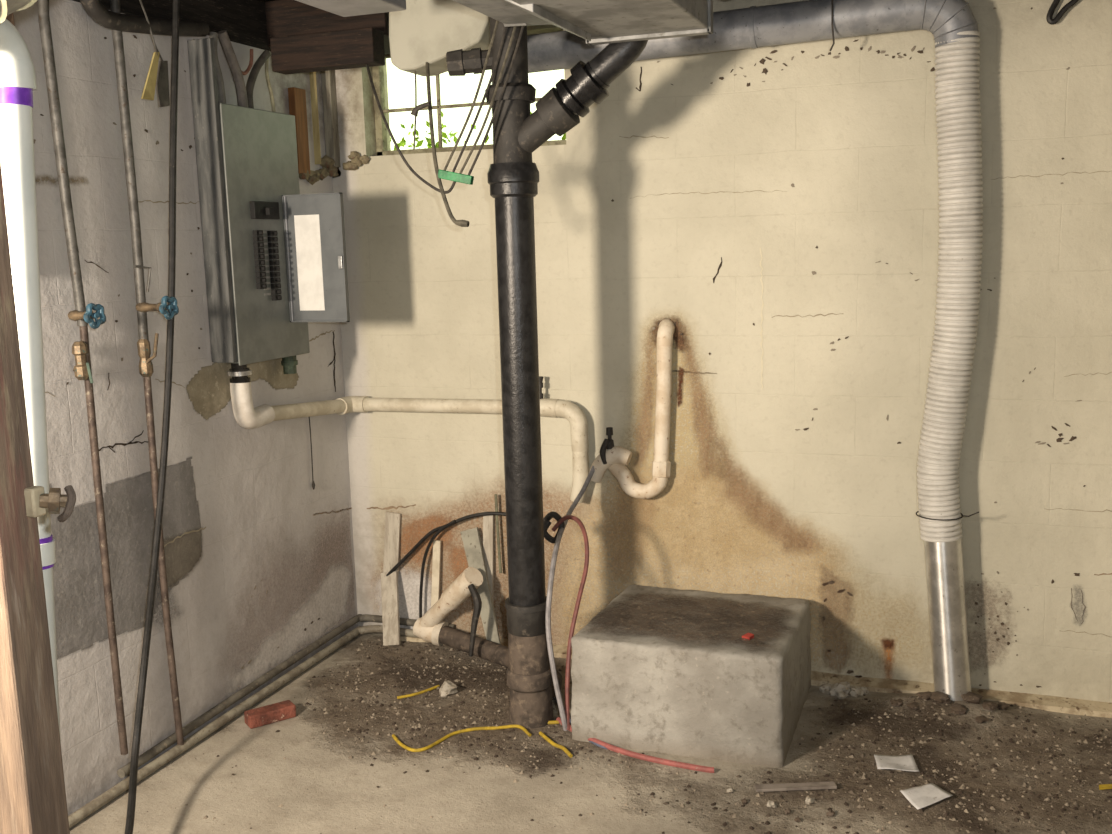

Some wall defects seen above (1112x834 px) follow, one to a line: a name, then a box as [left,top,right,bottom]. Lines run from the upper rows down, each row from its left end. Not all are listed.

flaking render [156,362,232,420]
flaking render [247,358,299,390]
leakage [543,320,839,661]
peeling [51,457,206,659]
leakage [398,497,509,639]
leakage [974,600,1029,656]
corrosion [883,640,893,679]